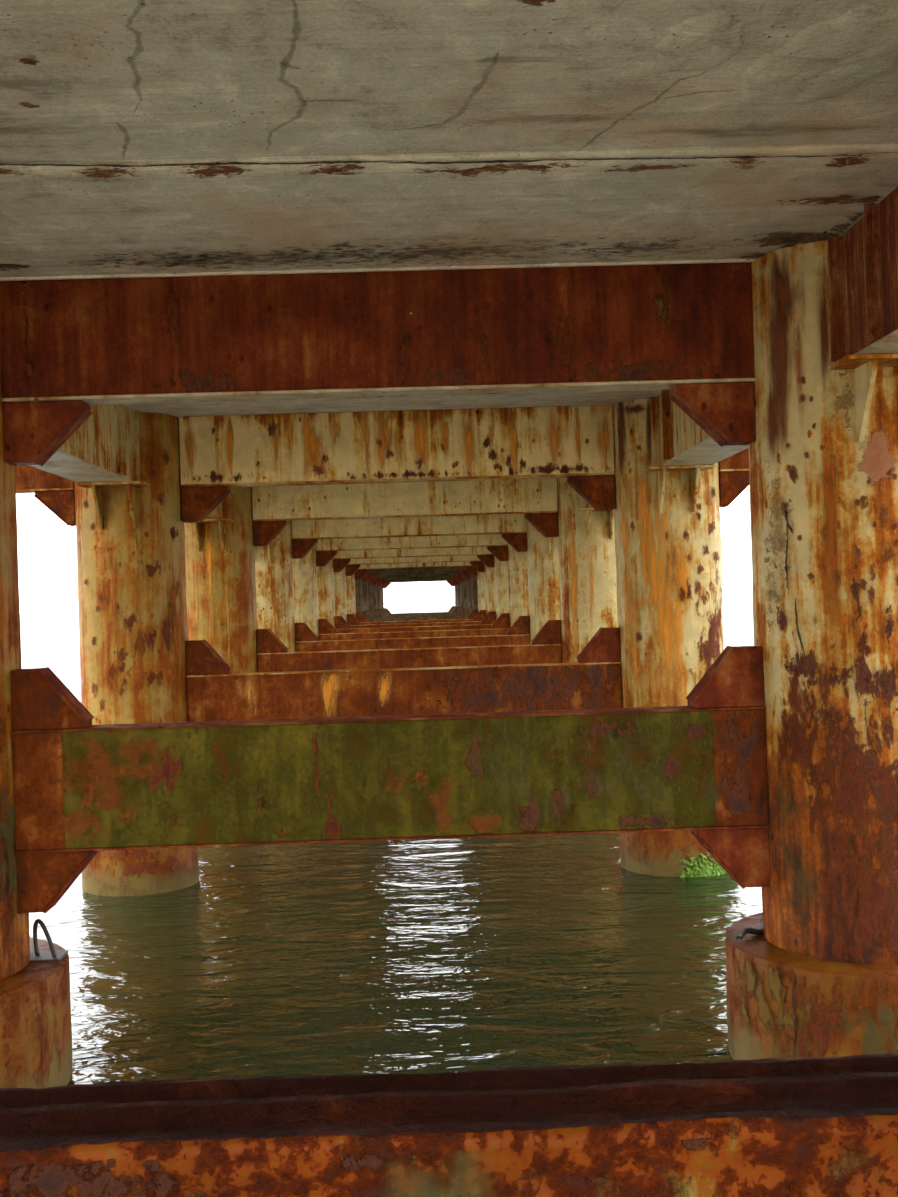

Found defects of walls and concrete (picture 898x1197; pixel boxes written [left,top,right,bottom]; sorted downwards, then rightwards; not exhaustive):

rust [153,369,234,392]
rust [412,365,476,386]
rust [582,357,679,381]
rust [767,255,802,454]
rust [820,287,828,378]
rust [186,423,266,483]
rust [269,415,339,478]
rust [500,400,723,704]
rust [823,451,838,612]
rust [408,527,635,742]
rust [775,565,898,963]
rust [0,1159,176,1197]